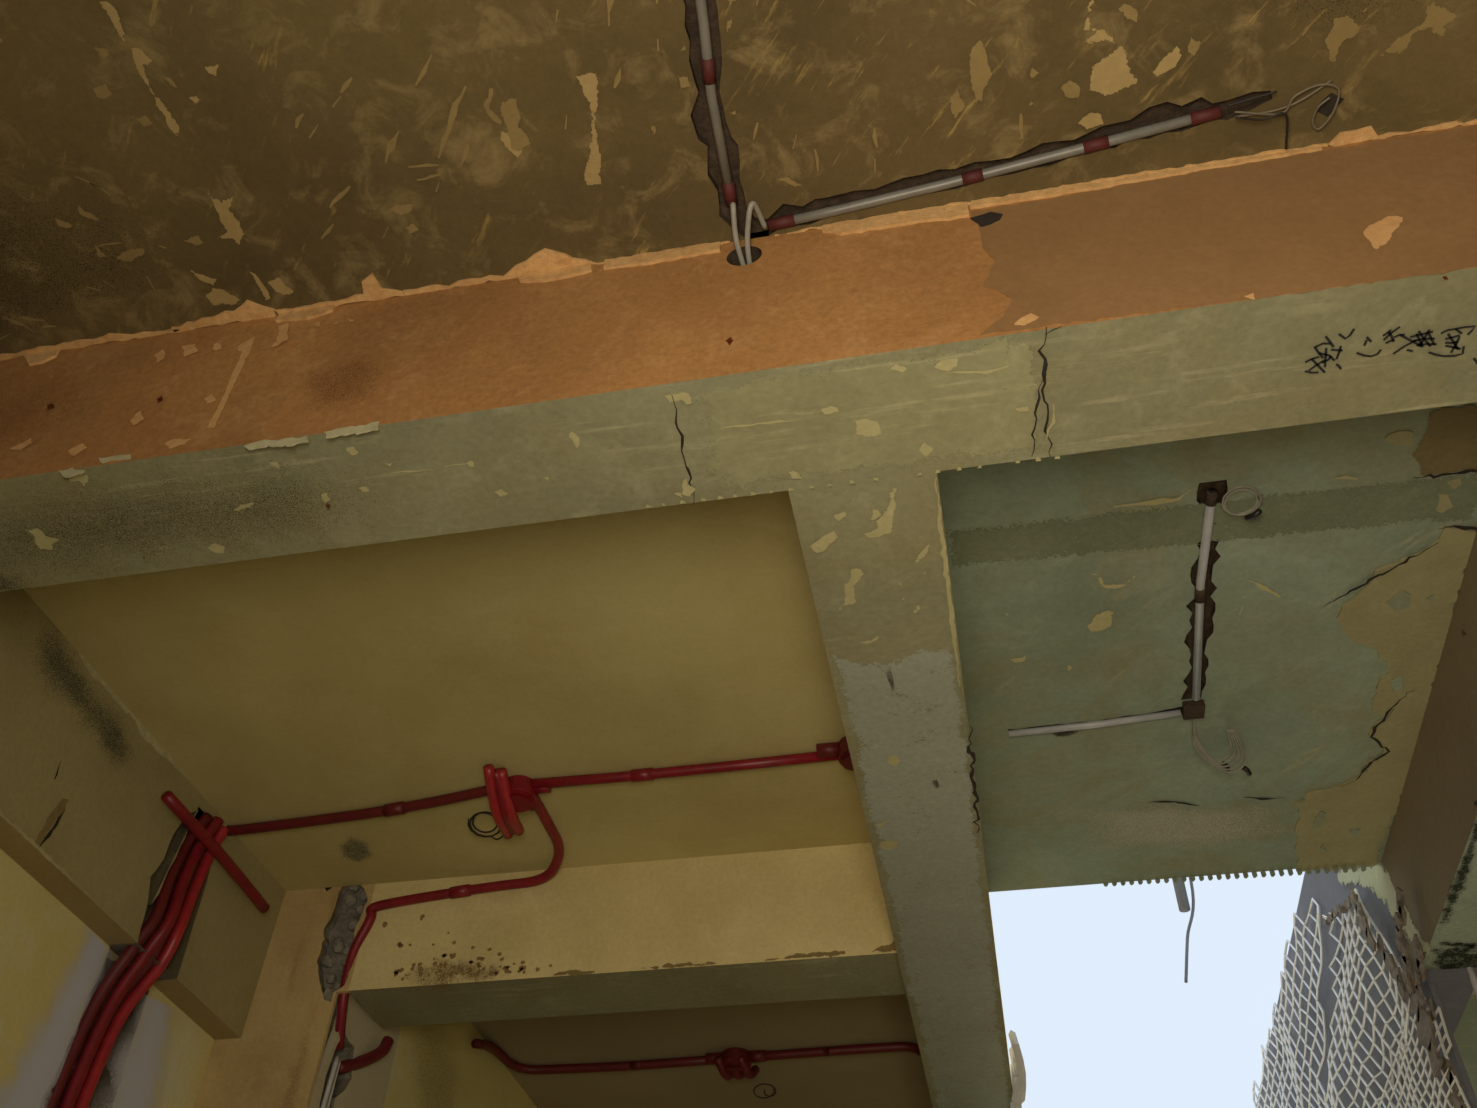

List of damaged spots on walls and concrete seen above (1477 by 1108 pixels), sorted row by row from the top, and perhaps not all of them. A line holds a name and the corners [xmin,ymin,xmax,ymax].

peeling [100,1,199,136]
peeling [1061,0,1201,98]
peeling [576,72,602,186]
peeling [184,192,244,246]
peeling [970,211,1003,227]
peeling [1363,216,1403,249]
crack [1031,326,1062,457]
crack [672,396,694,504]
damp [0,448,416,778]
peeling [1103,405,1477,887]
crack [966,726,980,833]
damp [1429,821,1477,970]